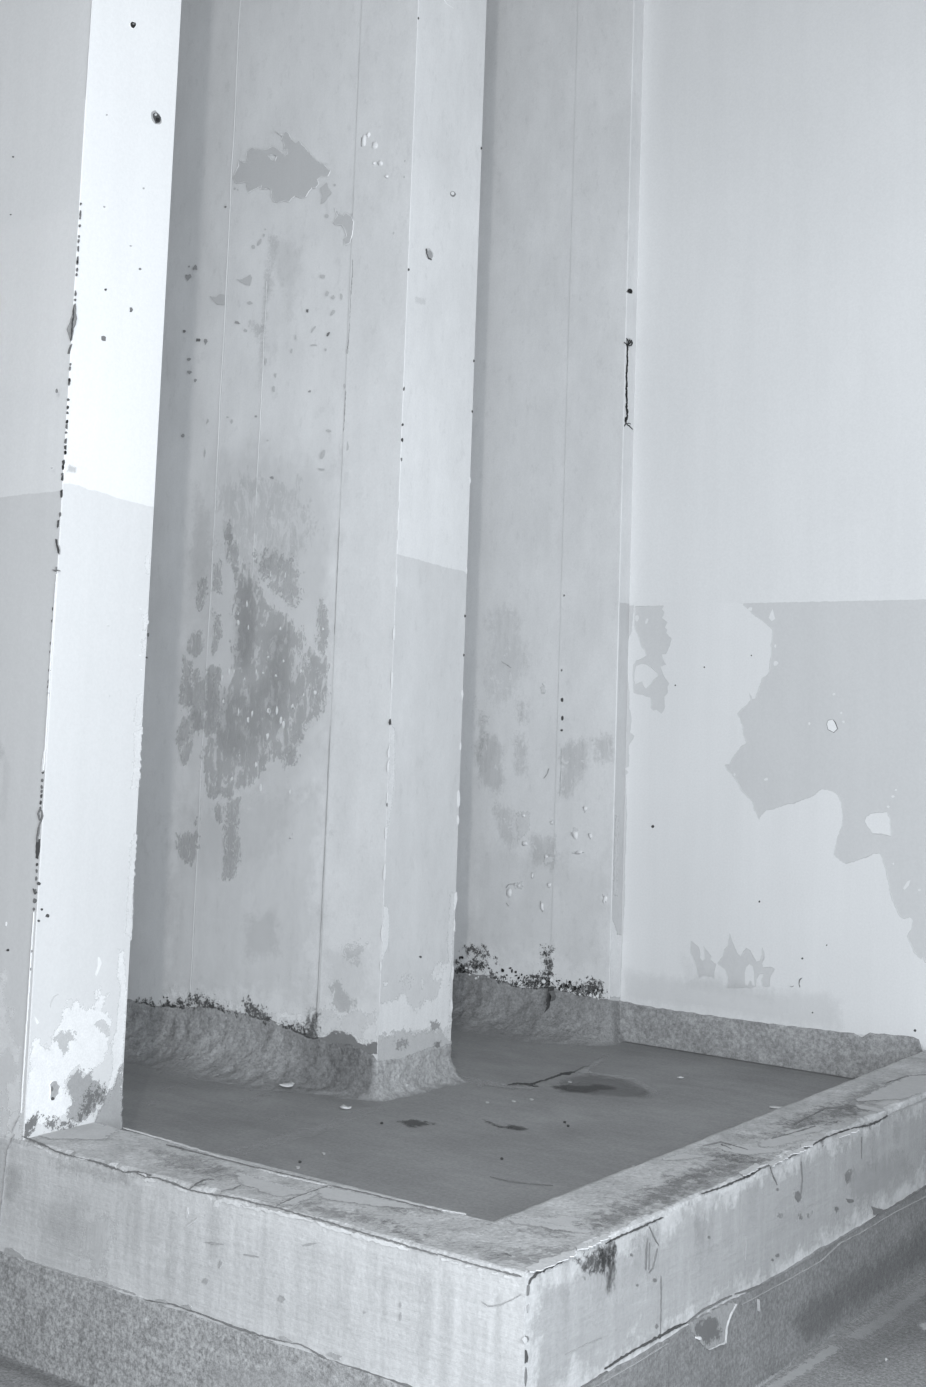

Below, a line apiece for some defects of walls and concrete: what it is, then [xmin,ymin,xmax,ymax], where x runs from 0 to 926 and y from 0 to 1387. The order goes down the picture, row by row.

peeling [233,132,354,246]
crack [624,338,633,430]
peeling [20,203,137,1149]
peeling [139,608,149,670]
peeling [203,558,331,799]
peeling [130,693,143,789]
peeling [570,601,926,1051]
peeling [273,891,554,1061]
water stain [454,944,608,999]
water stain [556,1084,613,1093]
flaking render [213,1197,410,1251]
flaking render [688,1302,737,1350]